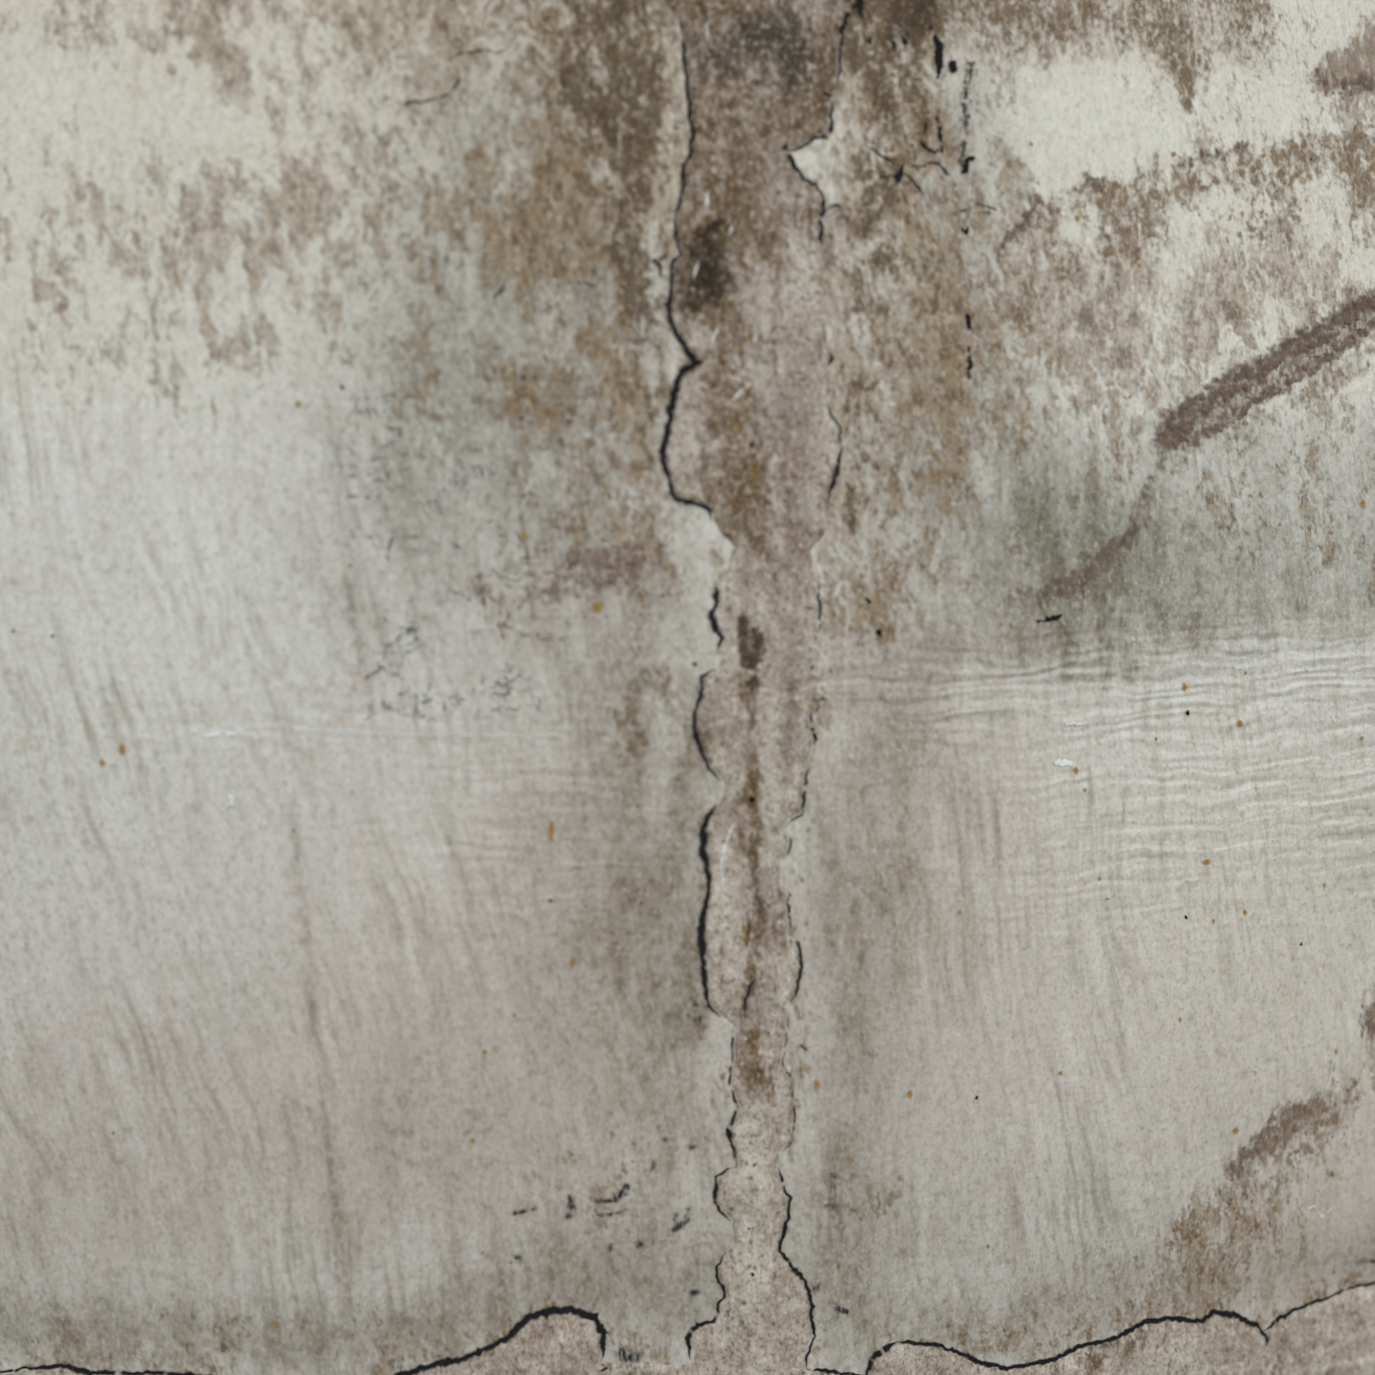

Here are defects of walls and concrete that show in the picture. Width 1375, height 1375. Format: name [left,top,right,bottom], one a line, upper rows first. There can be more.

crack [777,0,864,250]
damp [883,0,1270,112]
damp [999,15,1375,261]
crack [659,38,712,521]
damp [682,217,735,313]
damp [1142,290,1375,505]
damp [1040,519,1146,605]
crack [348,366,758,1358]
crack [778,576,1375,1375]
damp [1218,1081,1358,1200]
crack [0,1363,212,1375]
crack [394,1306,610,1375]